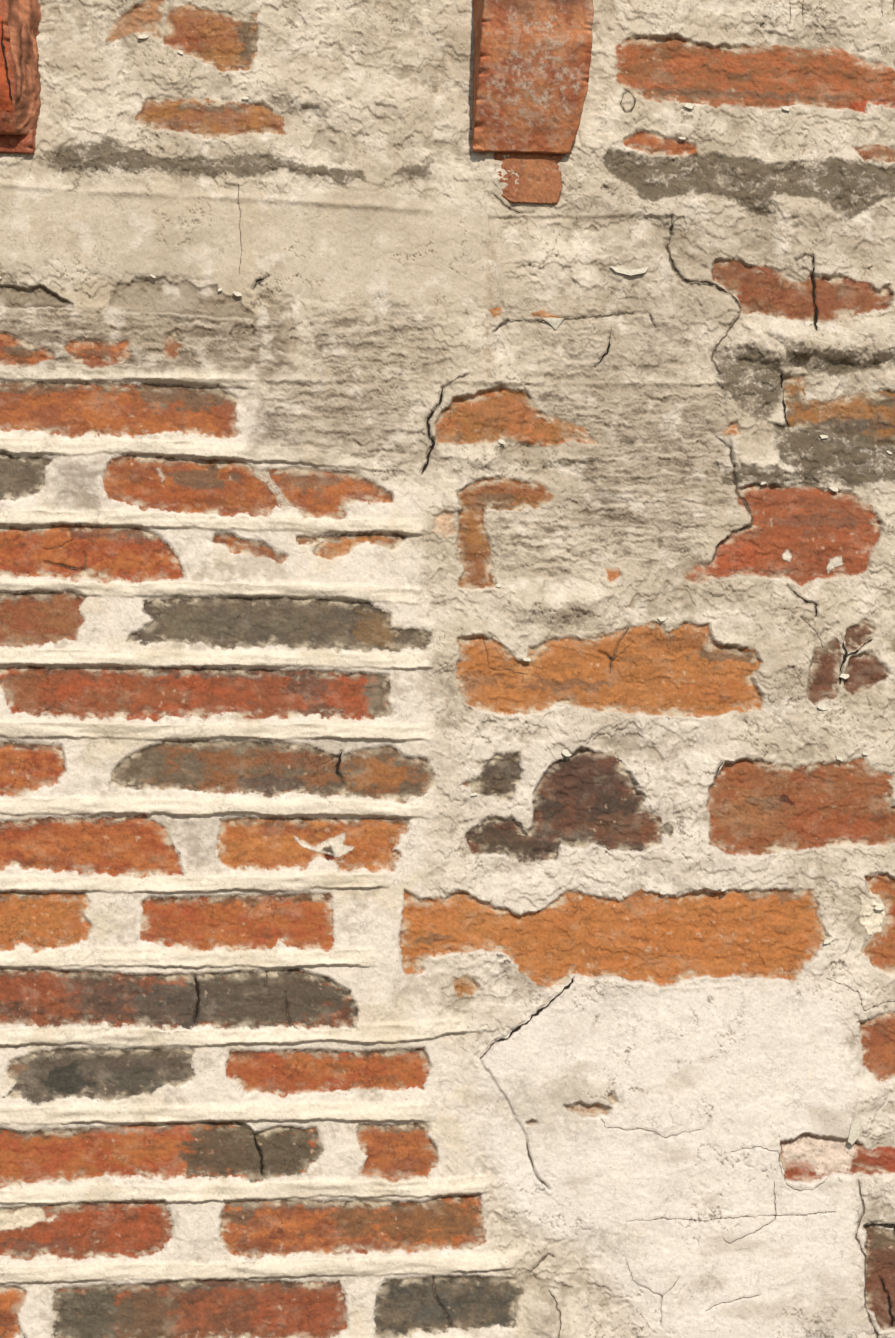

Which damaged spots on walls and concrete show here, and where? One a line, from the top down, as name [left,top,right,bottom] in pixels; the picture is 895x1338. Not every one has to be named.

spalling [610,27,895,119]
spalling [0,277,77,313]
spalling [103,271,258,323]
crack [494,312,656,367]
crack [665,216,741,374]
crack [422,373,469,473]
spalling [429,381,605,455]
spalling [432,471,560,596]
spalling [676,479,888,590]
spalling [450,616,769,723]
spalling [458,744,674,868]
spalling [394,882,836,994]